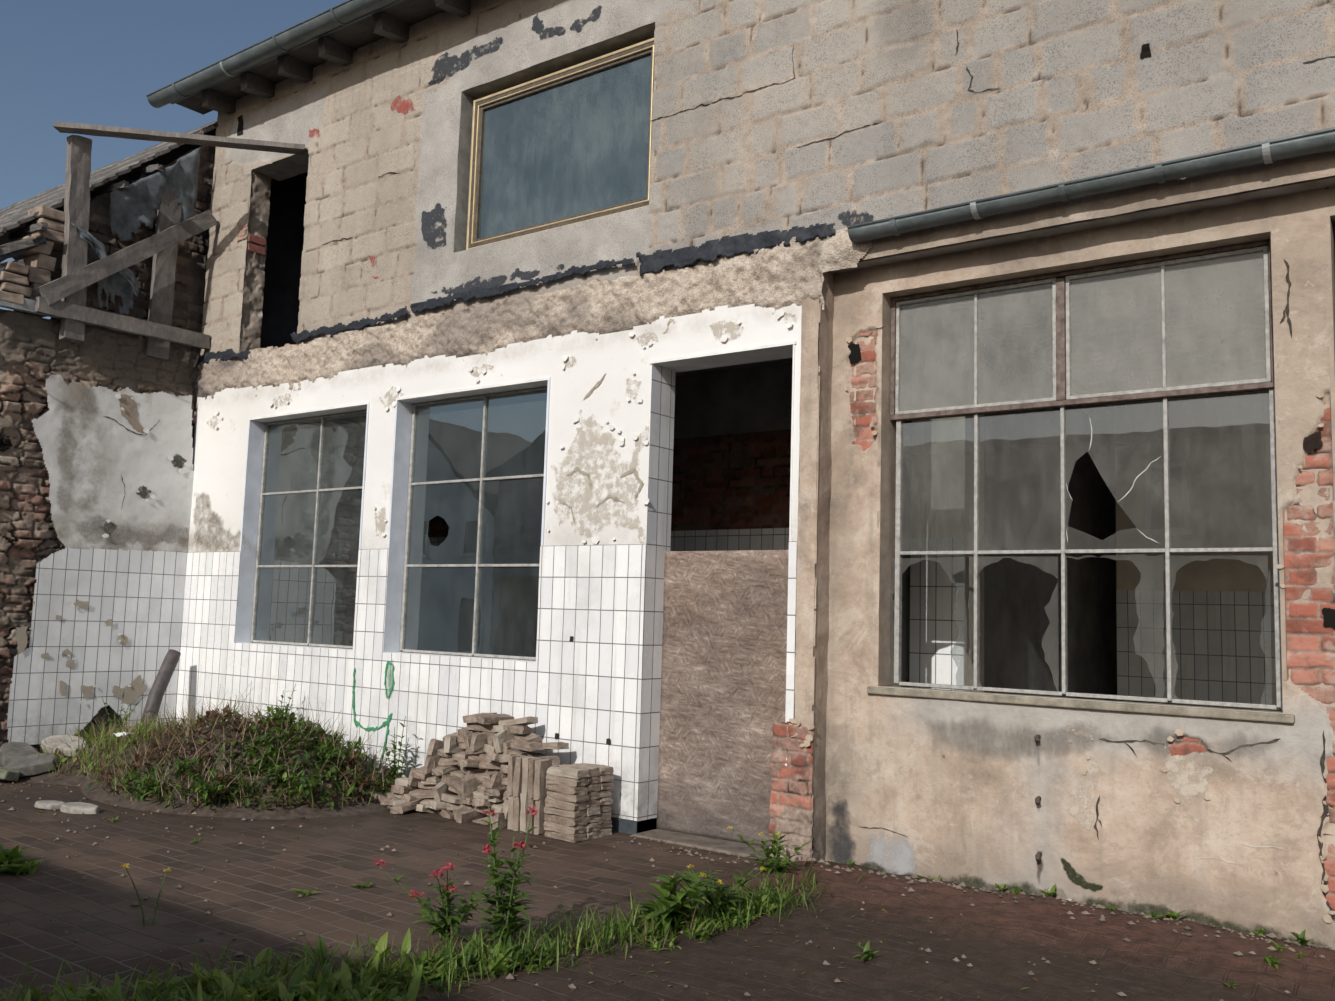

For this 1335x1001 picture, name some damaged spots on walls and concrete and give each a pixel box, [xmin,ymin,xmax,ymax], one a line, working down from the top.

crack [1280,260,1292,337]
peeling [115,394,149,434]
spalling [845,330,878,451]
peeling [136,486,155,502]
peeling [168,455,188,474]
peeling [546,416,649,545]
spalling [1276,393,1335,824]
crack [1099,738,1164,757]
crack [1207,738,1281,762]
damp [832,803,854,864]
damp [869,840,914,875]
crack [1317,731,1335,921]